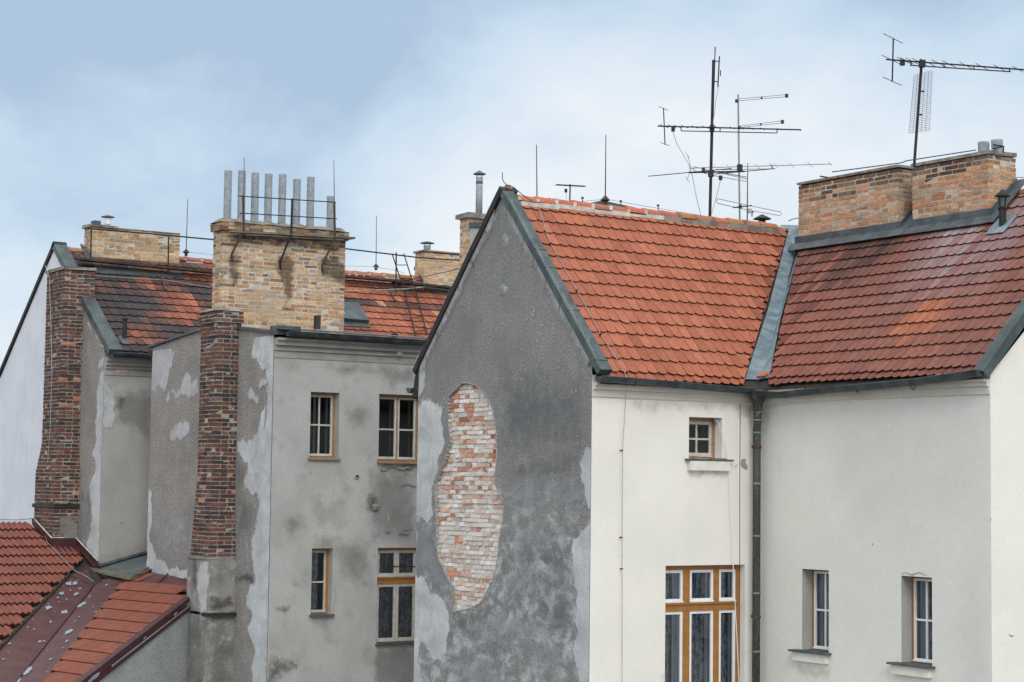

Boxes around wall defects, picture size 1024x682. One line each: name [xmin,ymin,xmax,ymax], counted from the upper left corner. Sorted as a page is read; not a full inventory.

leakage [414,370,450,682]
spalling [434,382,504,613]
leakage [571,523,590,682]